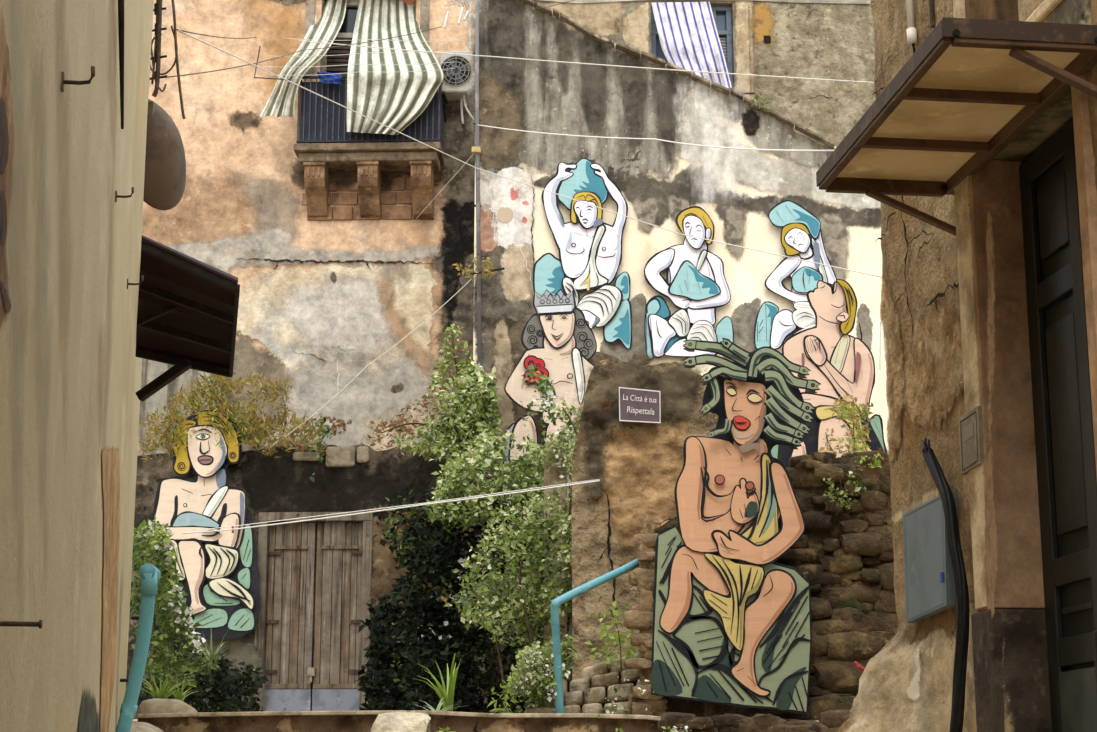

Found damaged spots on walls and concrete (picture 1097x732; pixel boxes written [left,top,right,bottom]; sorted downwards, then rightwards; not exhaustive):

water stain [290,160,305,189]
water stain [328,171,358,187]
water stain [381,171,411,190]
water stain [432,0,881,420]
crack [236,212,463,293]
flaking render [236,260,444,451]